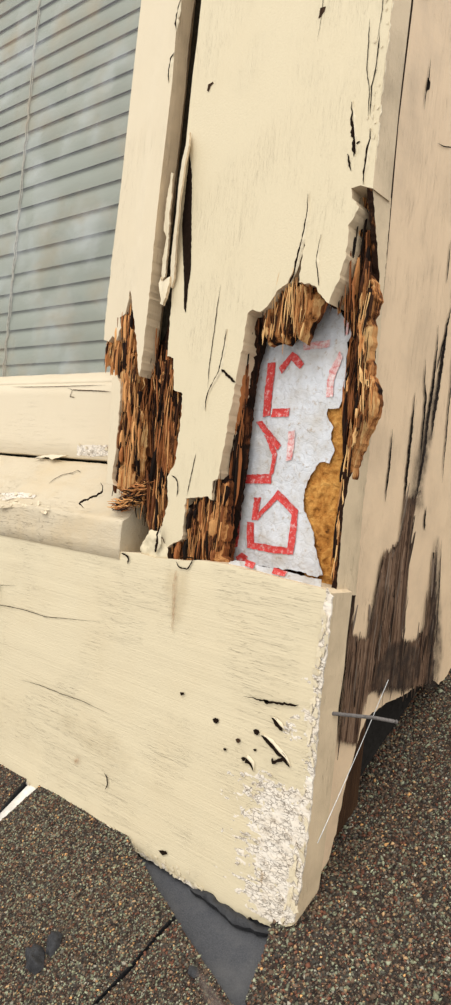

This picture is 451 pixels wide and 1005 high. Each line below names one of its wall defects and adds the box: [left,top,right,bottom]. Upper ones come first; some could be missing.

crack [347,0,383,181]
peeling [159,132,191,306]
crack [205,292,235,411]
peeling [0,492,50,515]
water stain [412,433,432,497]
water stain [373,566,441,691]
crack [241,696,298,771]
peeling [214,588,334,925]